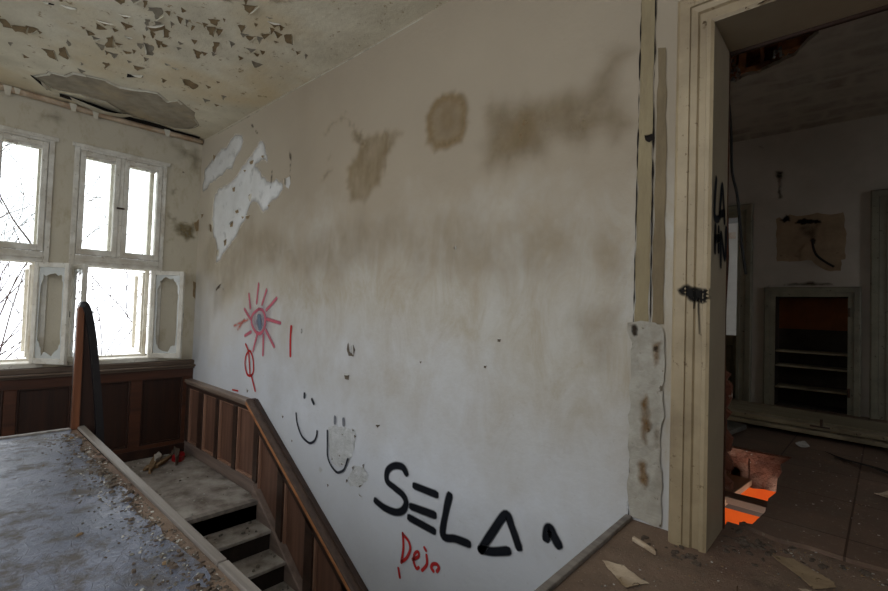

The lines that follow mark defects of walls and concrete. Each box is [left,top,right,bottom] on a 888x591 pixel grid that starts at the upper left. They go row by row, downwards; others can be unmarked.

peeling [0,16,42,47]
flaking render [31,0,308,129]
peeling [194,136,290,261]
flaking render [627,321,665,527]